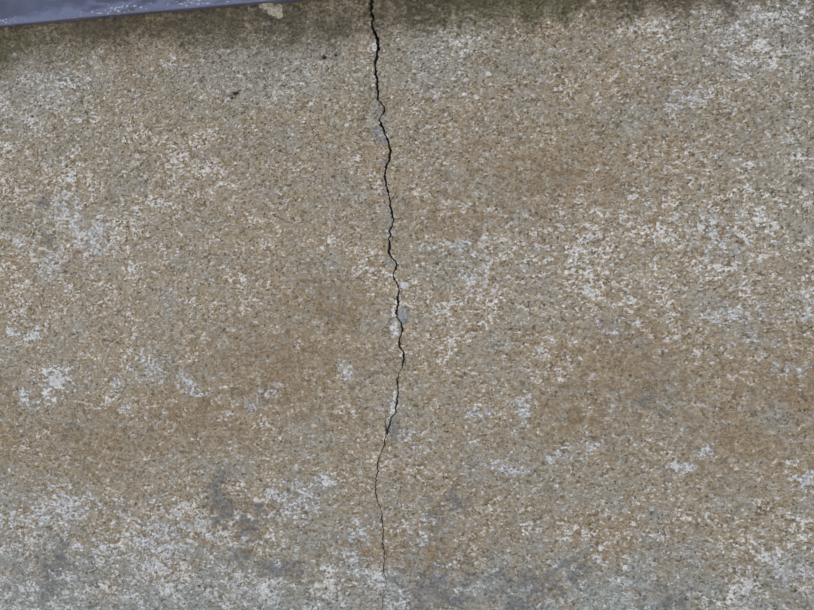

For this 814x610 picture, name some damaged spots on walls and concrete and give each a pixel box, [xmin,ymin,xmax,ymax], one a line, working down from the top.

crack [366,0,409,608]